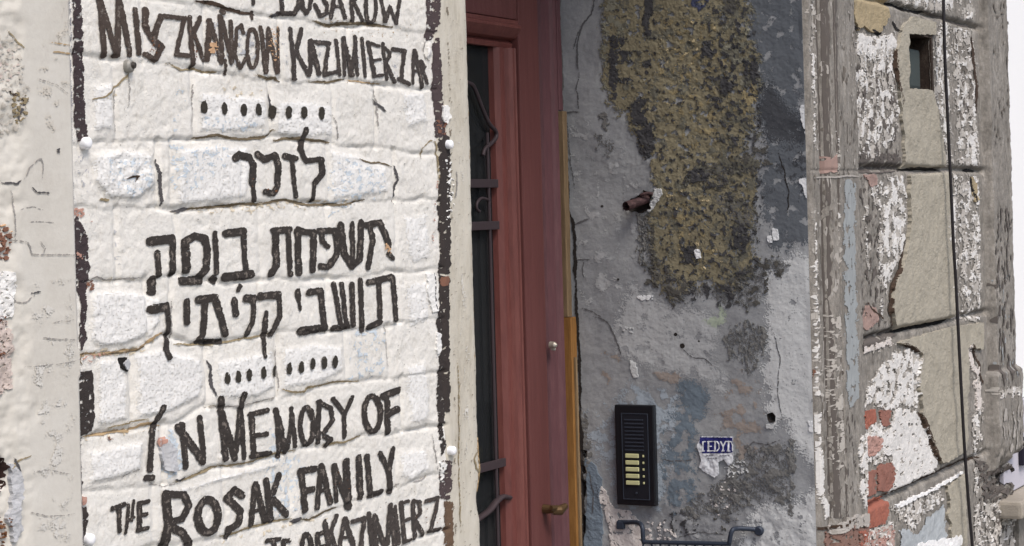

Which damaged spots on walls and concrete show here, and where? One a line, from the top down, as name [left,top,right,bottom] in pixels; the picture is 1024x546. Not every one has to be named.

peeling [855,31,900,158]
peeling [888,0,981,320]
crack [746,329,782,448]
peeling [811,208,821,396]
peeling [808,337,1016,546]